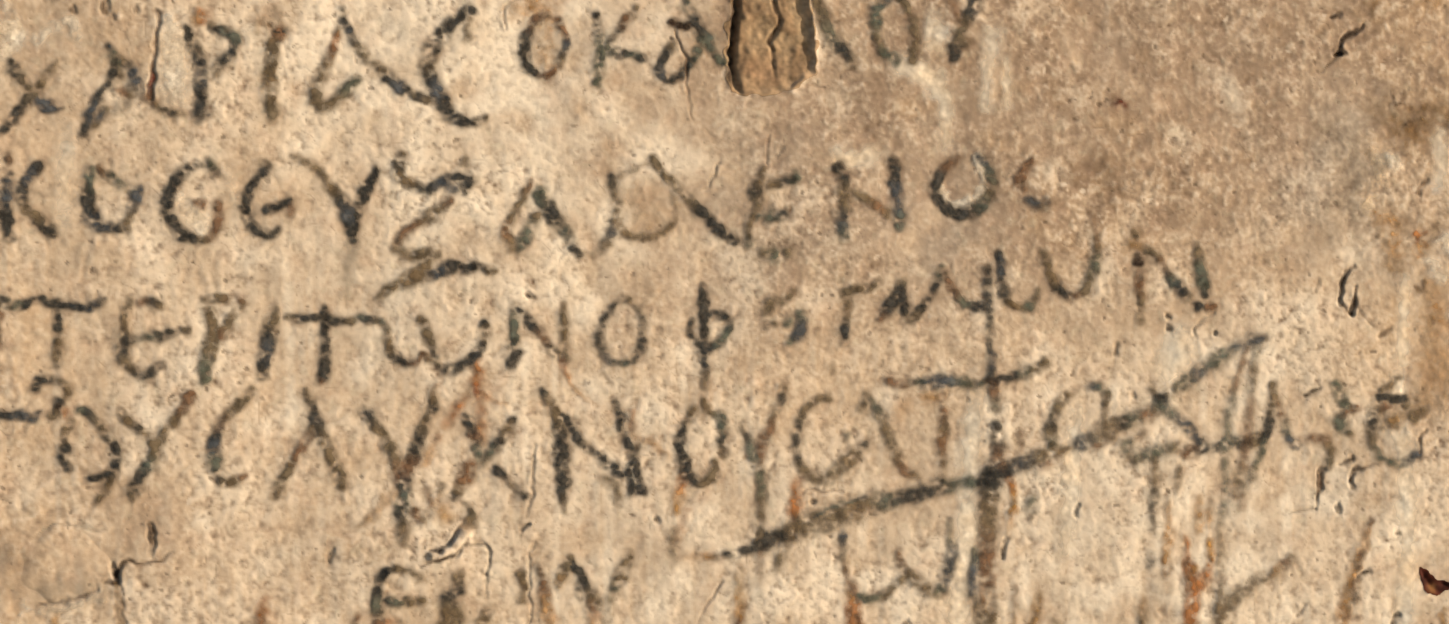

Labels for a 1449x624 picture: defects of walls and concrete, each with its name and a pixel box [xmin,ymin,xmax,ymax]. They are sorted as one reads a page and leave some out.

spalling [723,0,819,96]